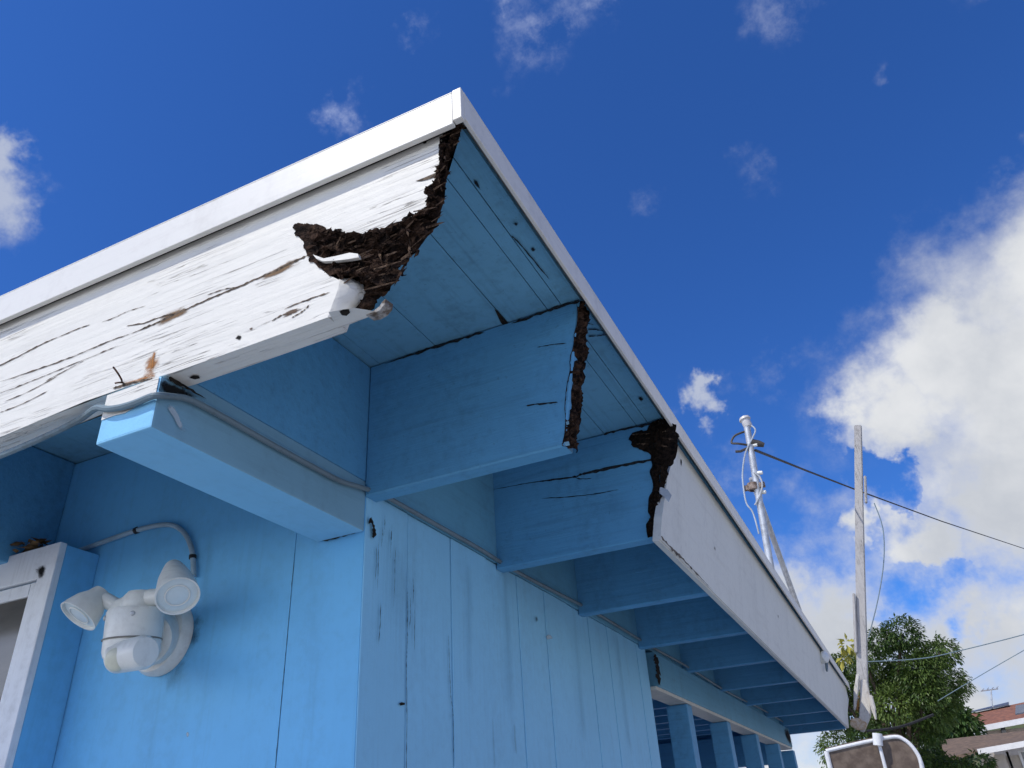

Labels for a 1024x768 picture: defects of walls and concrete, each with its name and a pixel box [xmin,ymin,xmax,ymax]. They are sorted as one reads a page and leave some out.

peeling [314,253,361,264]
crack [0,256,305,412]
crack [539,323,607,347]
crack [497,459,651,499]